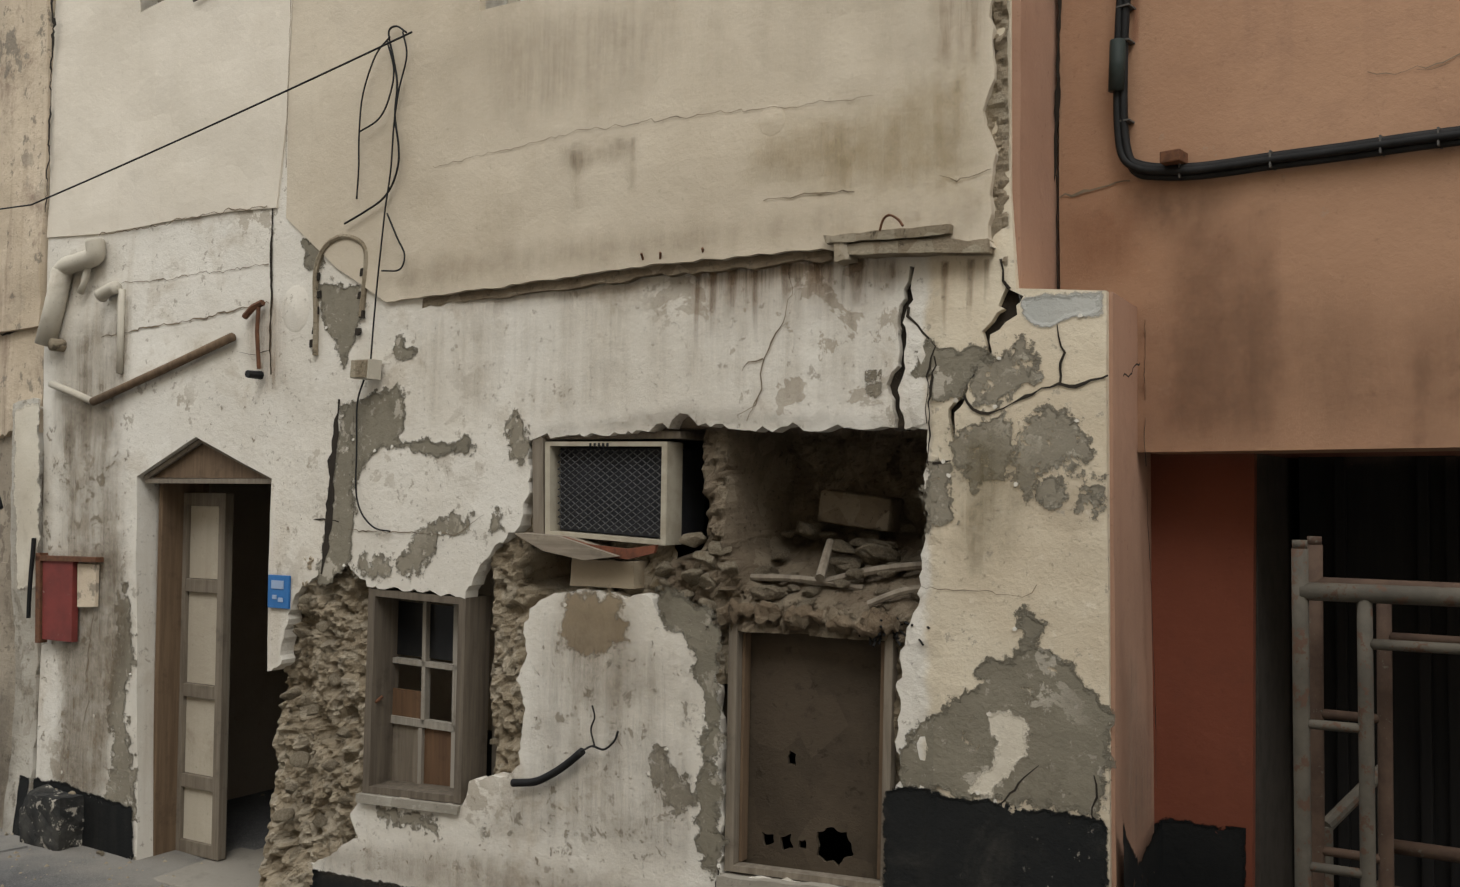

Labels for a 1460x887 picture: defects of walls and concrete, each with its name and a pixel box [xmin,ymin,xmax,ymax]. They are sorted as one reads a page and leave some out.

crack [433,95,873,168]
peeling [300,234,368,370]
peeling [392,333,418,361]
crack [740,268,793,420]
crack [890,259,1145,465]
peeling [316,383,505,586]
spalling [468,291,1116,887]
crack [907,585,1037,597]